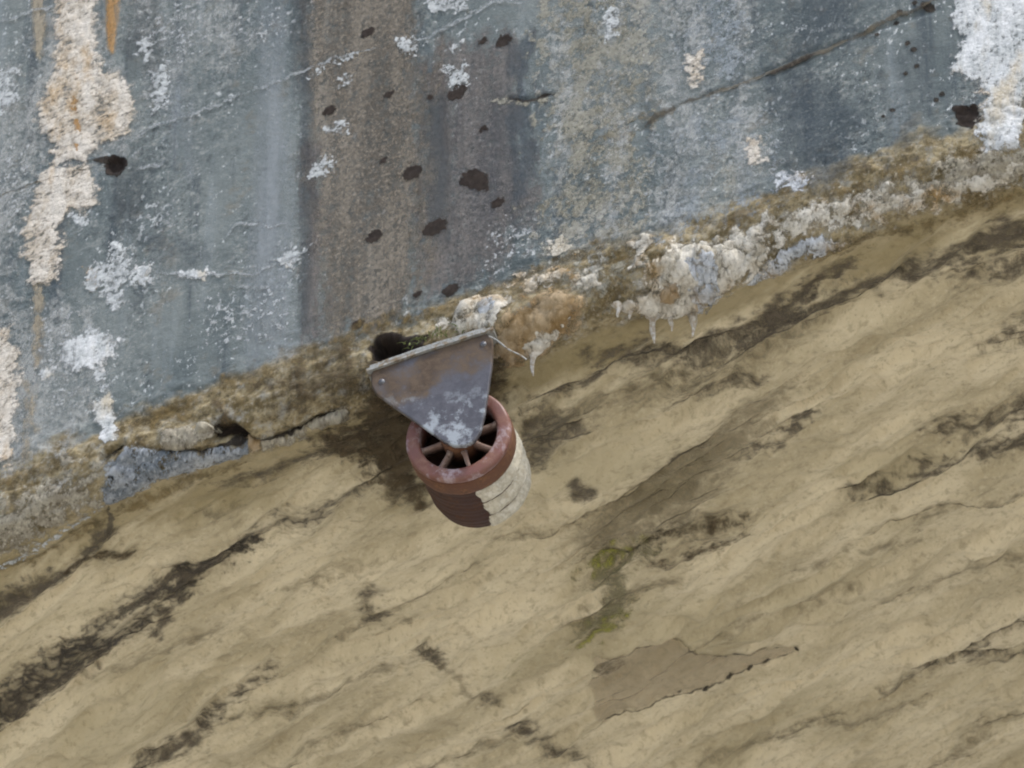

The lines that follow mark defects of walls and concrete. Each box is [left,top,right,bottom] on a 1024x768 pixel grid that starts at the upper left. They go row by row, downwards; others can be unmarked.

rust [106,0,118,53]
crack [642,0,934,125]
leakage [0,0,191,471]
leakage [195,0,1024,402]
spalling [0,400,350,569]
leakage [0,348,434,727]
leakage [568,478,596,501]
leakage [585,392,817,571]
leakage [843,396,1024,501]
leakage [134,666,276,768]
peeling [594,647,799,730]